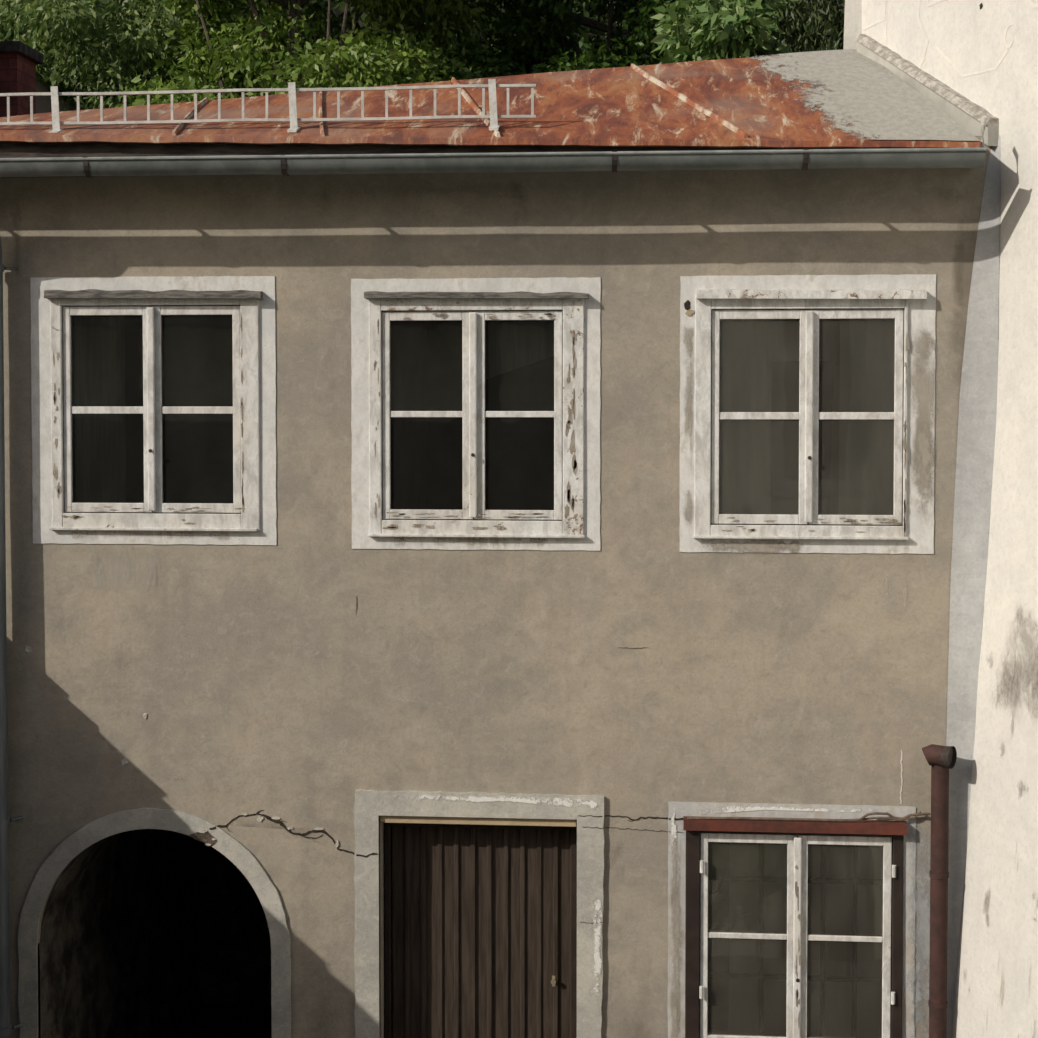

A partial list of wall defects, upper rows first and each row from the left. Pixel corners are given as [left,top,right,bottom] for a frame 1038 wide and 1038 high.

peeling [565,333,578,518]
damp [998,611,1038,706]
spalling [188,830,217,847]
crack [209,810,378,858]
crack [578,815,684,833]